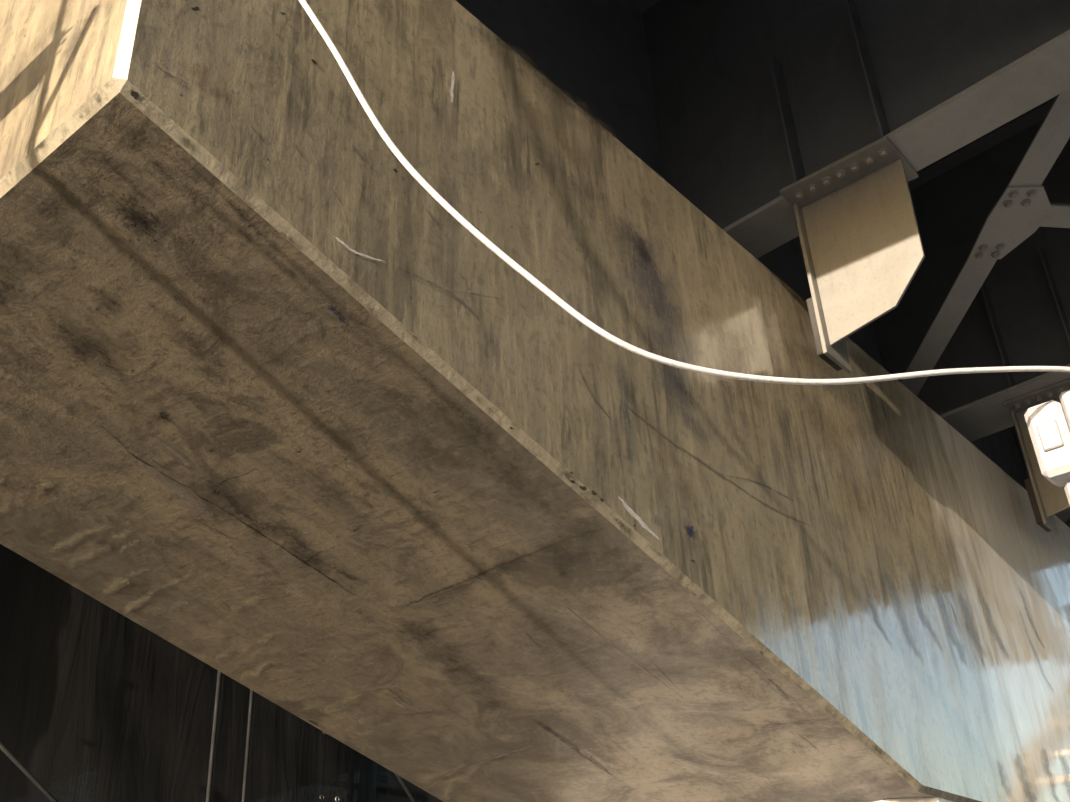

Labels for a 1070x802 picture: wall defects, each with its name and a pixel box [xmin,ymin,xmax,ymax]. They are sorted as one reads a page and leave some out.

crack [118,440,356,583]